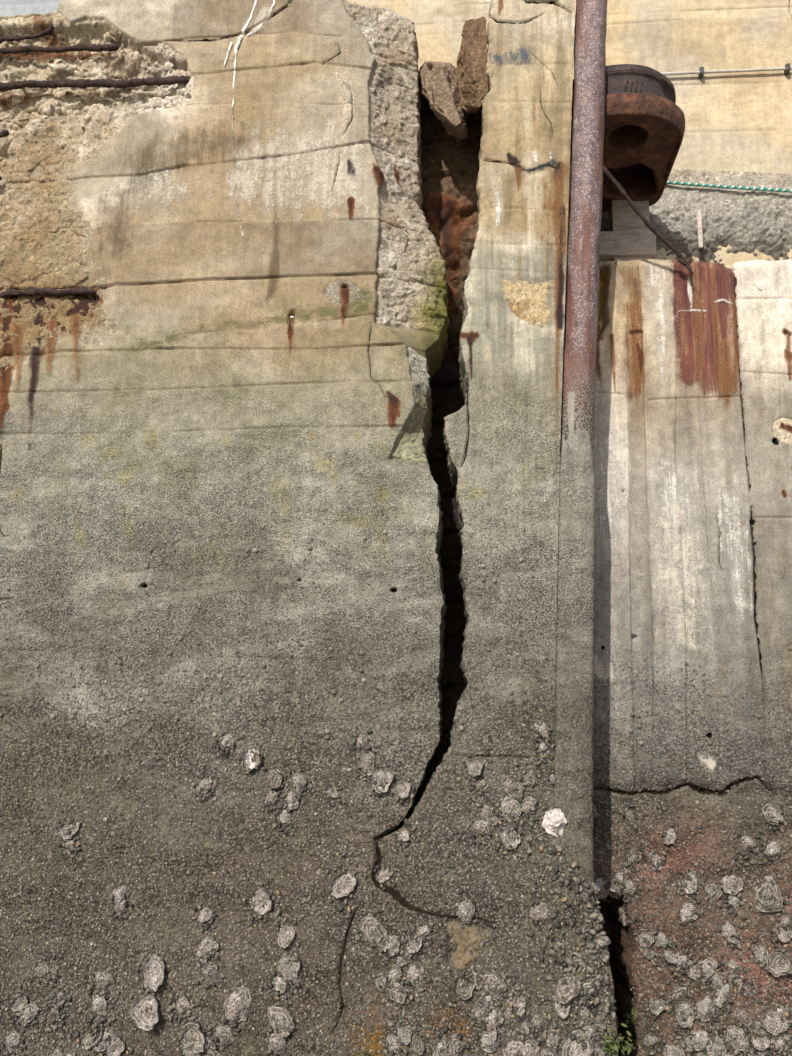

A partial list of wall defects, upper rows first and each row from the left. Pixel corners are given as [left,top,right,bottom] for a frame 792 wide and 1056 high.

spalling [0,13,194,384]
leakage [129,137,188,202]
leakage [219,0,368,218]
spalling [322,0,450,347]
corrosion [372,163,400,186]
corrosion [0,284,103,445]
corrosion [386,391,401,428]
spalling [390,347,431,466]
crack [372,93,554,923]
corrosion [670,259,739,407]
crack [733,274,764,694]
crack [593,777,766,795]